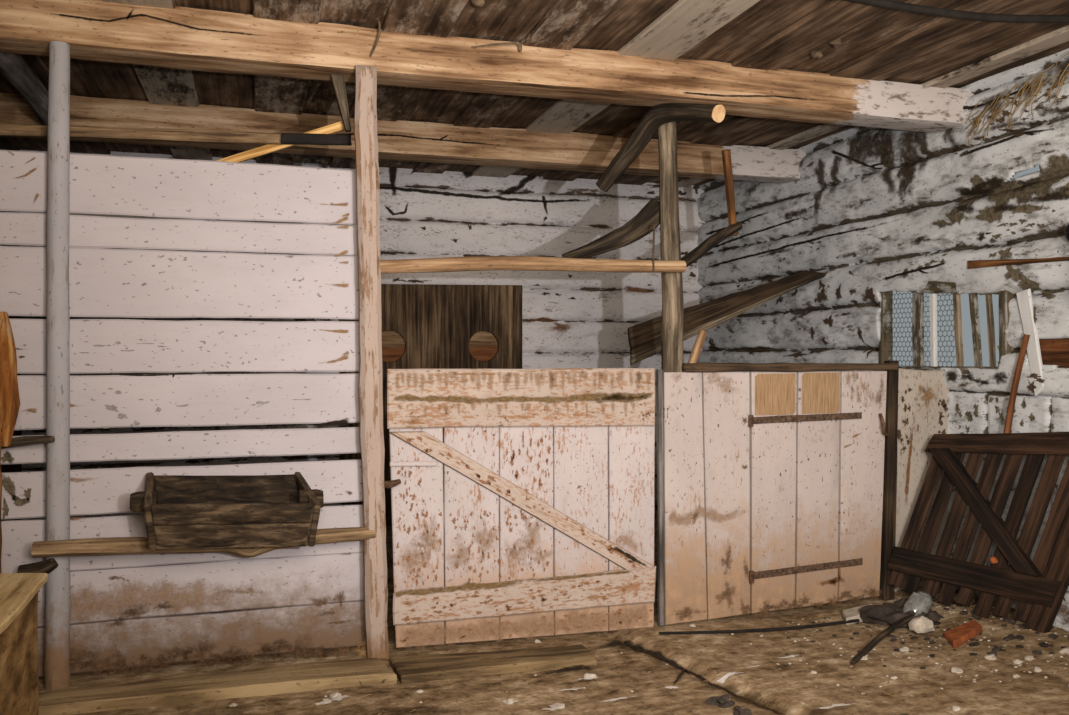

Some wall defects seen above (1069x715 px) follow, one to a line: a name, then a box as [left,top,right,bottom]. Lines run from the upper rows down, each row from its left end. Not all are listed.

crack [56,10,253,35]
peeling [901,154,1069,323]
peeling [799,280,879,346]